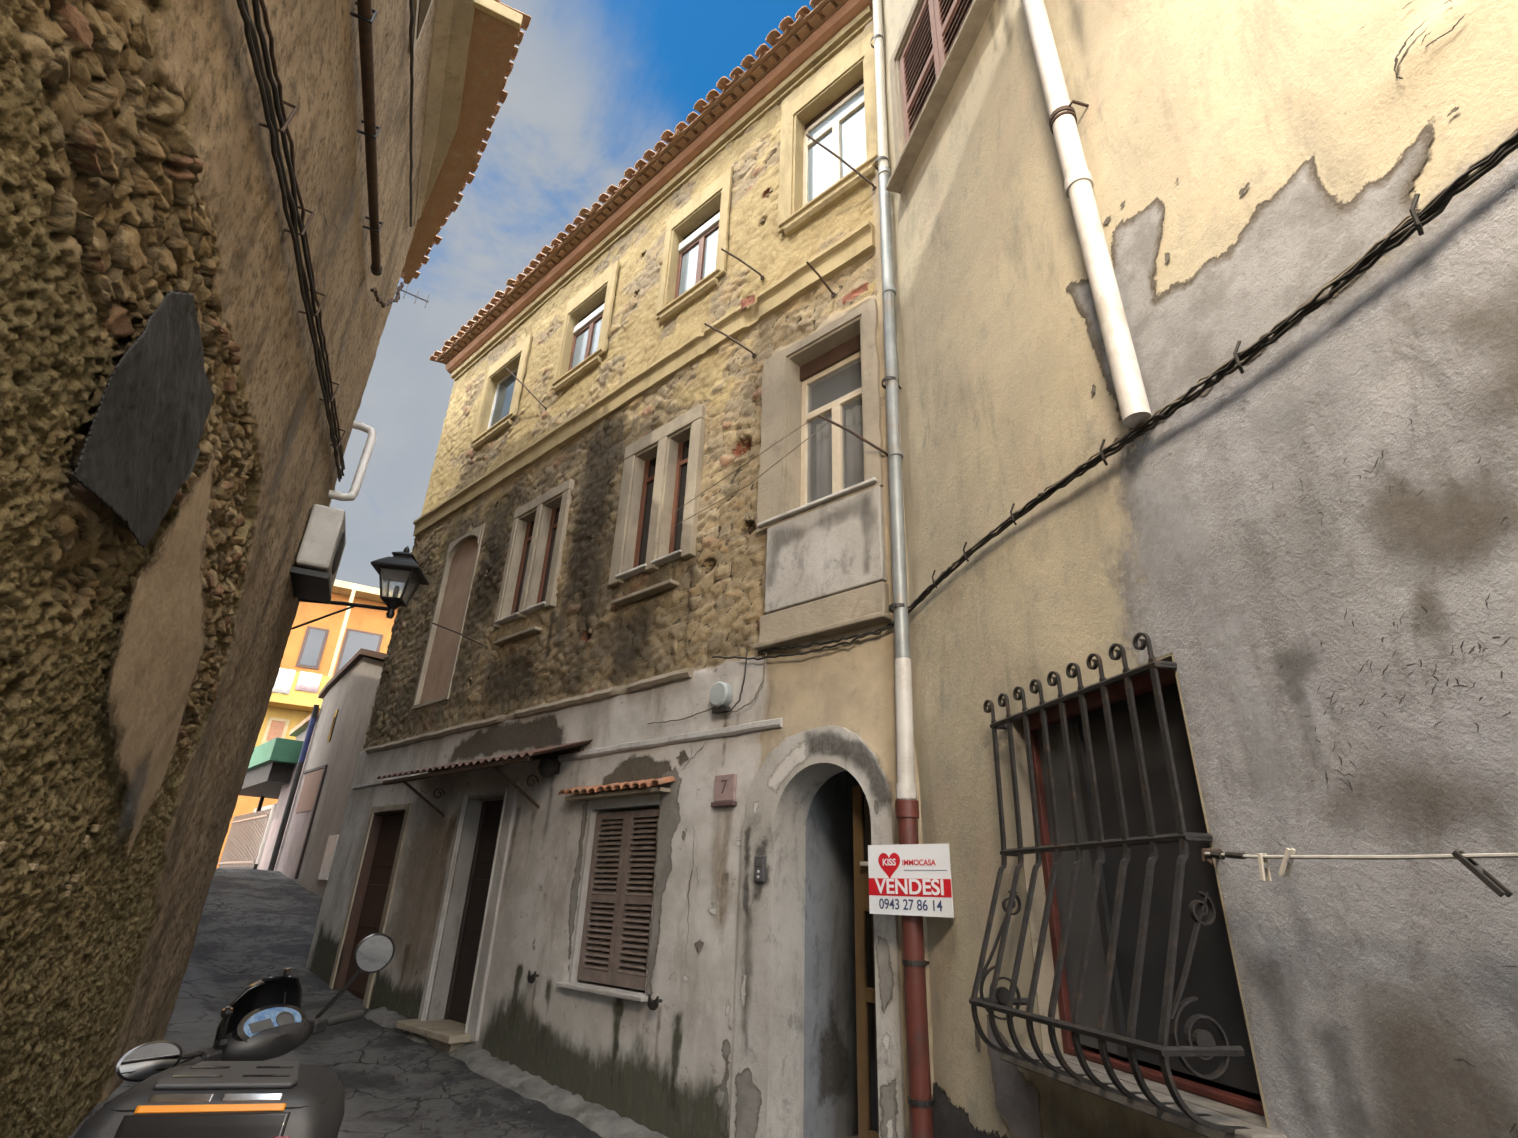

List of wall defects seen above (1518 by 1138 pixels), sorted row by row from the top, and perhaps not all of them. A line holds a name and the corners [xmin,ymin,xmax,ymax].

crack [1394,0,1466,79]
damp [772,530,799,568]
peeling [1066,106,1518,1138]
damp [480,964,730,1138]
peeling [716,1039,762,1138]